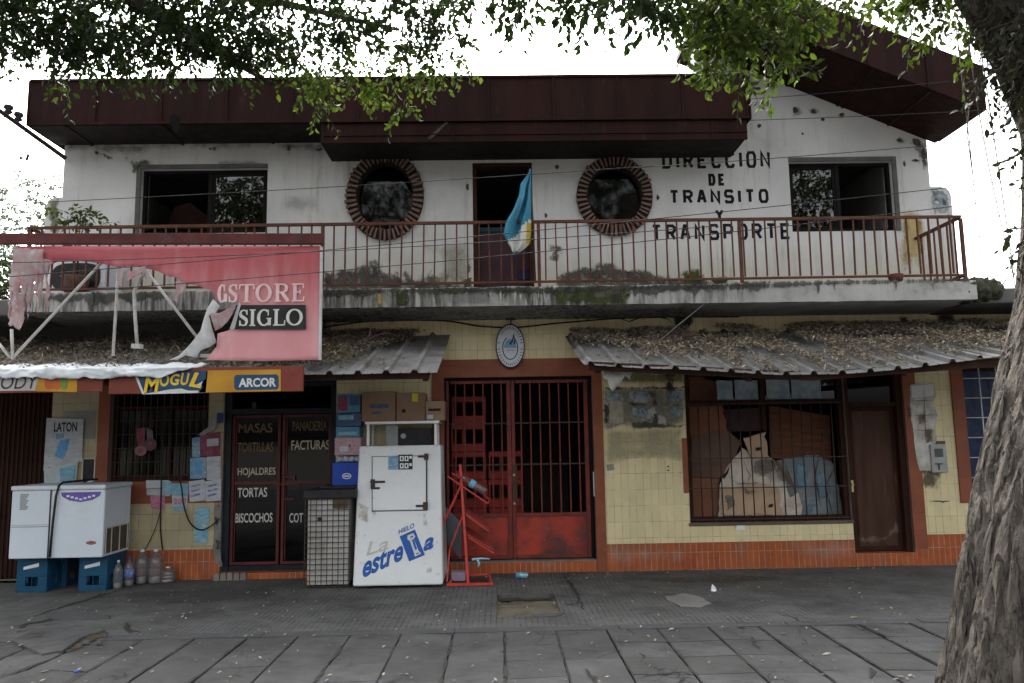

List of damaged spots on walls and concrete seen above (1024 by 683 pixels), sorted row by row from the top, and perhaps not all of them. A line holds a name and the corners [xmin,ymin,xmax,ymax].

corrosion [903,214,921,261]
damp [323,250,969,304]
peeling [604,386,685,428]
peeling [909,383,937,471]